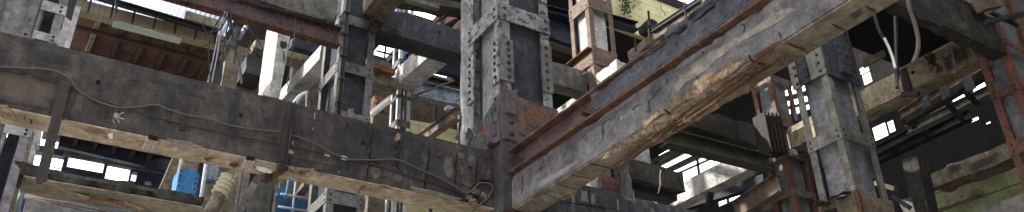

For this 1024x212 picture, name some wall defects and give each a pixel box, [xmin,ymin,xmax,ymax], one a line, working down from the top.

rust [513,96,558,136]
crack [522,79,668,211]